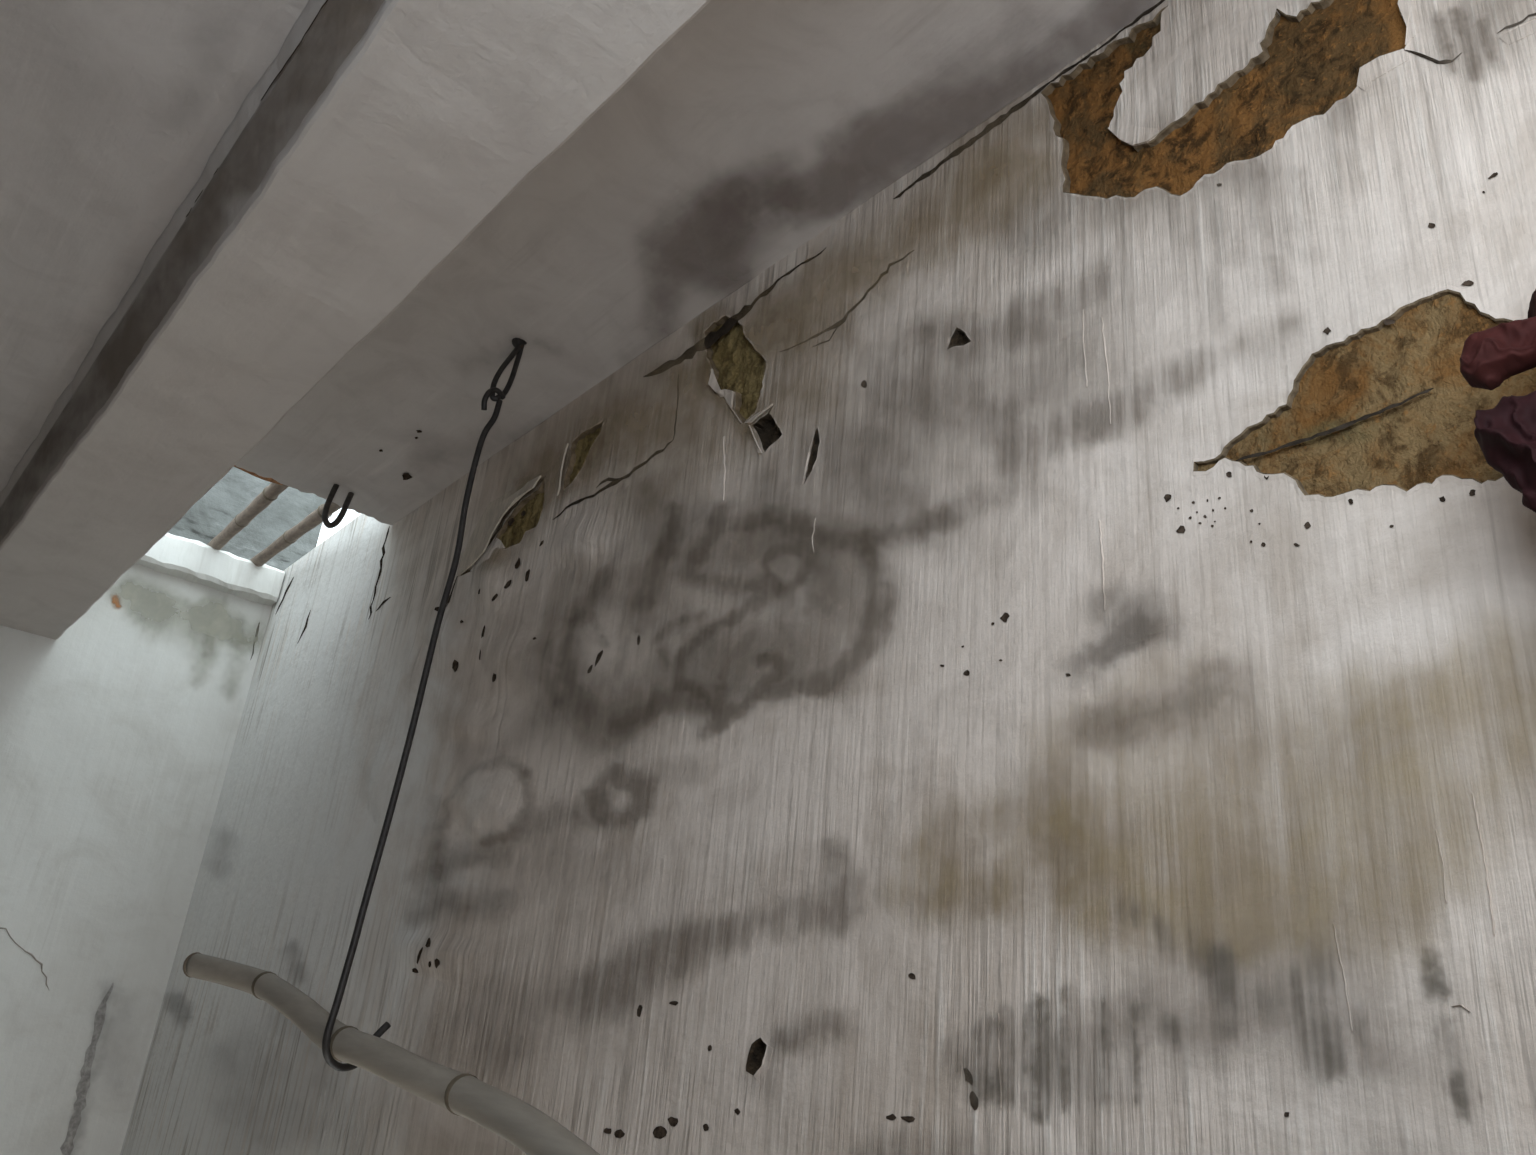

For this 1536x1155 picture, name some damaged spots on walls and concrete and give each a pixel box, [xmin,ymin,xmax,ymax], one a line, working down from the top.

crack [1497,13,1536,45]
crack [893,0,1165,199]
spalling [1039,0,1417,203]
water stain [594,358,717,444]
crack [553,248,826,520]
spalling [704,315,783,454]
water stain [1083,310,1111,424]
spalling [1190,280,1536,504]
flaking render [446,421,604,607]
water stain [741,518,873,619]
water stain [551,629,822,746]
crack [0,927,50,991]